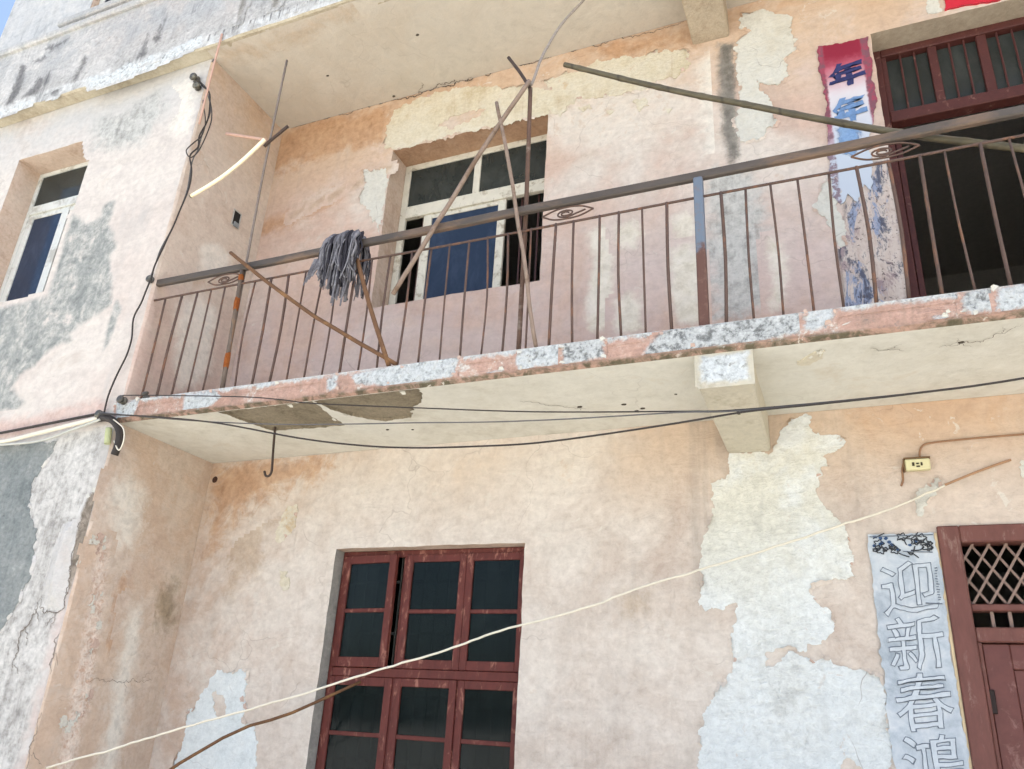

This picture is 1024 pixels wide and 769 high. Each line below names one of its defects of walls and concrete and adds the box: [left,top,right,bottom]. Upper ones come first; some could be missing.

water stain [1,32,94,110]
water stain [131,19,168,64]
water stain [206,0,331,42]
peeling [357,168,390,235]
peeling [382,40,715,173]
water stain [583,20,790,324]
peeling [731,9,800,144]
peeling [0,194,1024,769]
crack [12,513,85,674]